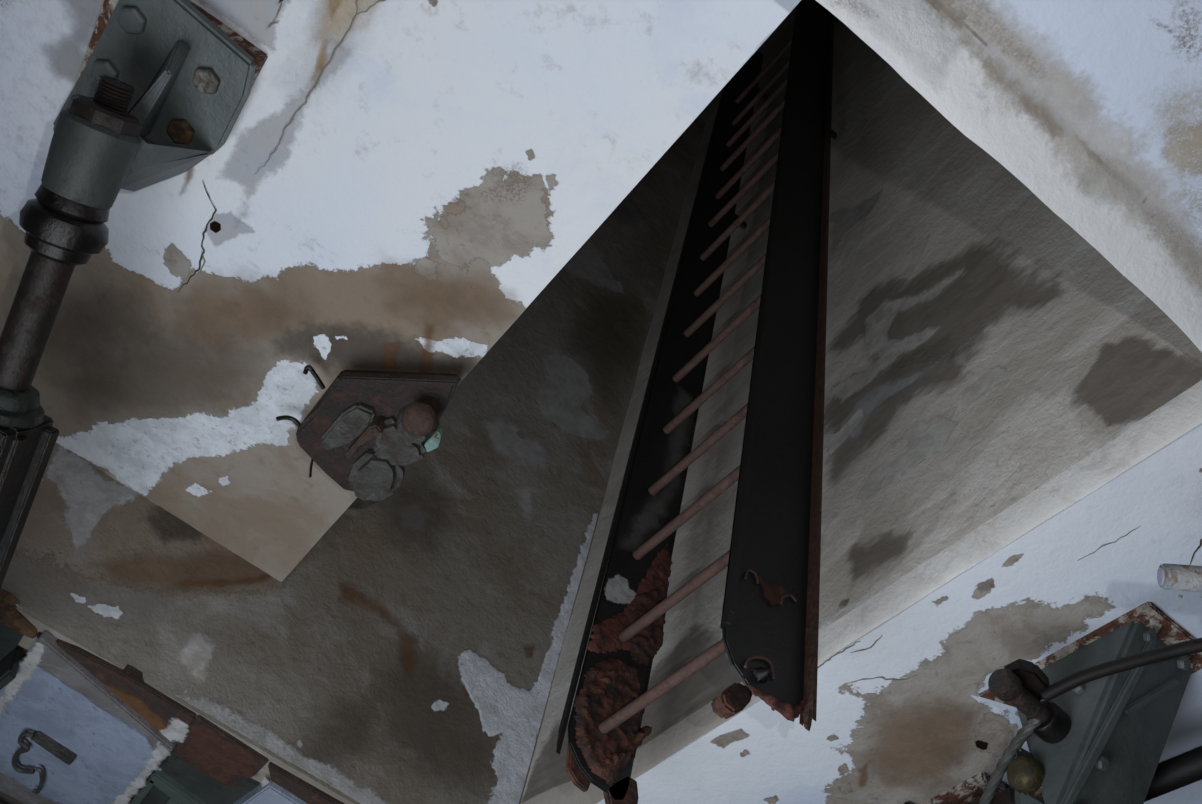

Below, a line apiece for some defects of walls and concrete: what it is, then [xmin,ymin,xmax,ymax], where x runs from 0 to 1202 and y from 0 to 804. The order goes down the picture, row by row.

crack [254,0,386,175]
flaking render [0,215,31,336]
crack [178,180,217,292]
flaking render [15,149,558,602]
water stain [823,235,1058,500]
water stain [1075,338,1202,425]
water stain [485,420,546,472]
peeling [87,604,123,619]
water stain [151,511,198,539]
water stain [115,558,271,587]
water stain [849,534,907,579]
peeling [431,699,449,711]